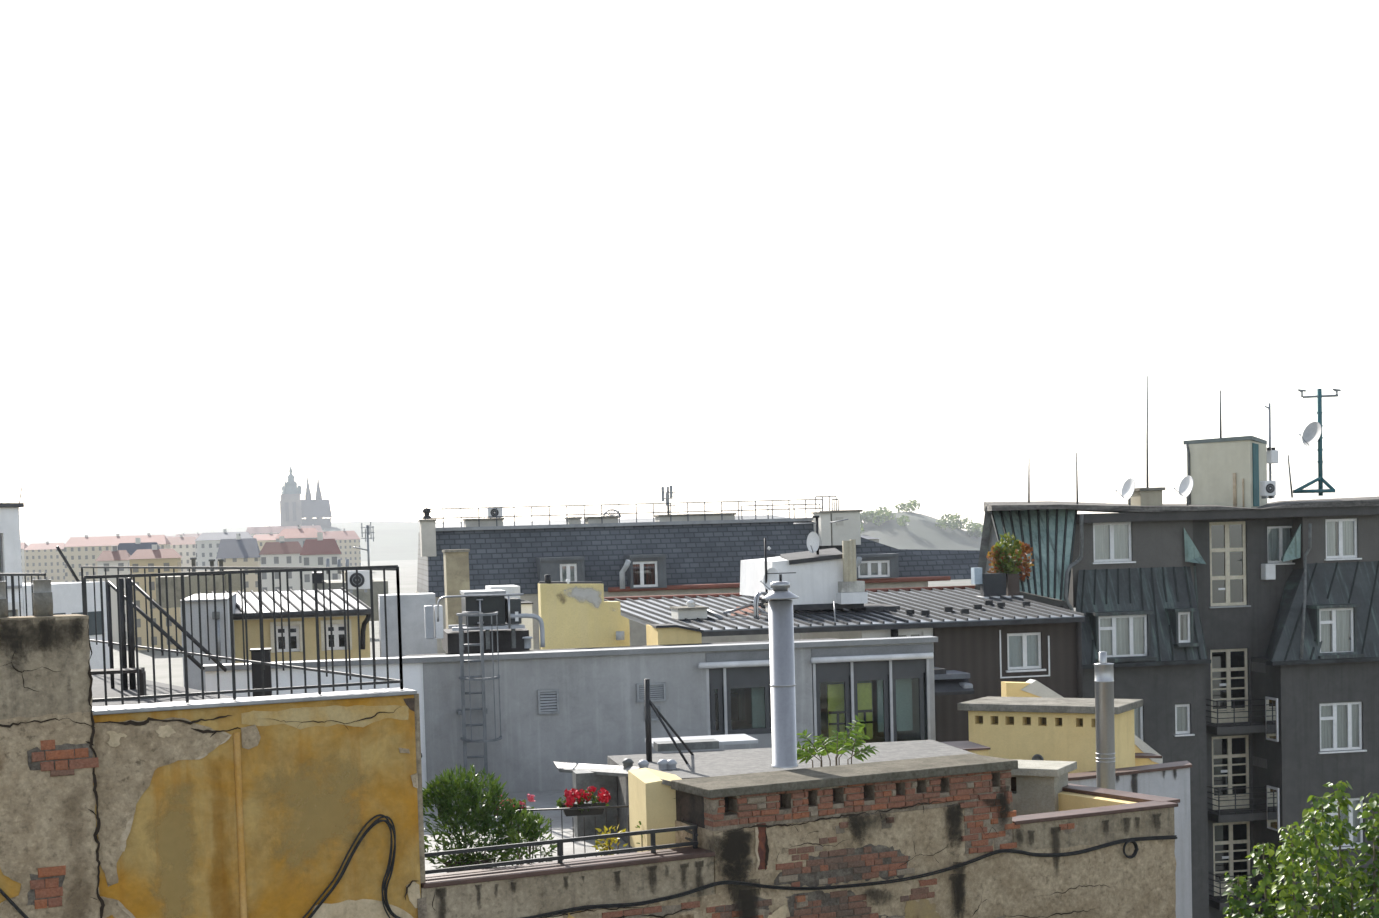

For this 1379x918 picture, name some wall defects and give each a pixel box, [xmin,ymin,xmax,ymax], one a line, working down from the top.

damp [0,618,83,653]
crack [0,619,241,918]
spalling [0,698,427,918]
damp [946,804,964,840]
damp [436,888,446,918]
damp [475,882,516,904]
spalling [545,894,738,918]
damp [648,828,761,918]
damp [949,862,965,915]
spalling [755,792,1176,918]